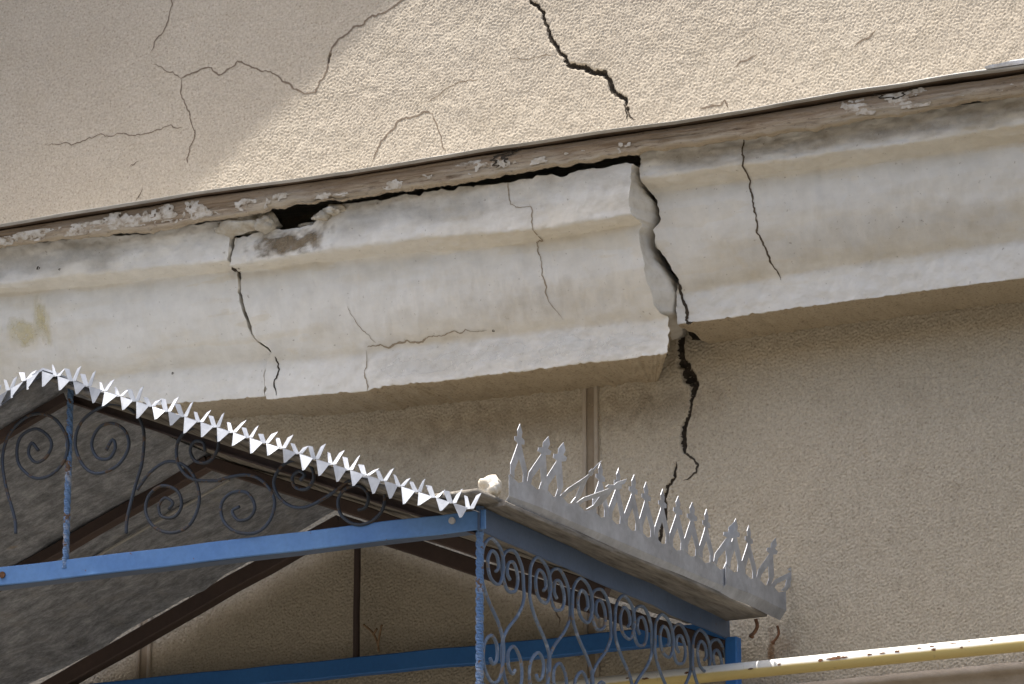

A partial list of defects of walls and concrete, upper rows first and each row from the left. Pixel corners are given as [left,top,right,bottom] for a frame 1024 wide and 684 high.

crack [50,0,403,163]
crack [372,79,478,161]
crack [509,0,636,120]
peeling [0,193,289,246]
spalling [298,192,349,228]
peeling [384,179,403,190]
crack [490,148,562,318]
crack [741,140,781,280]
crack [260,342,280,394]
crack [347,306,482,390]
crack [658,261,700,542]